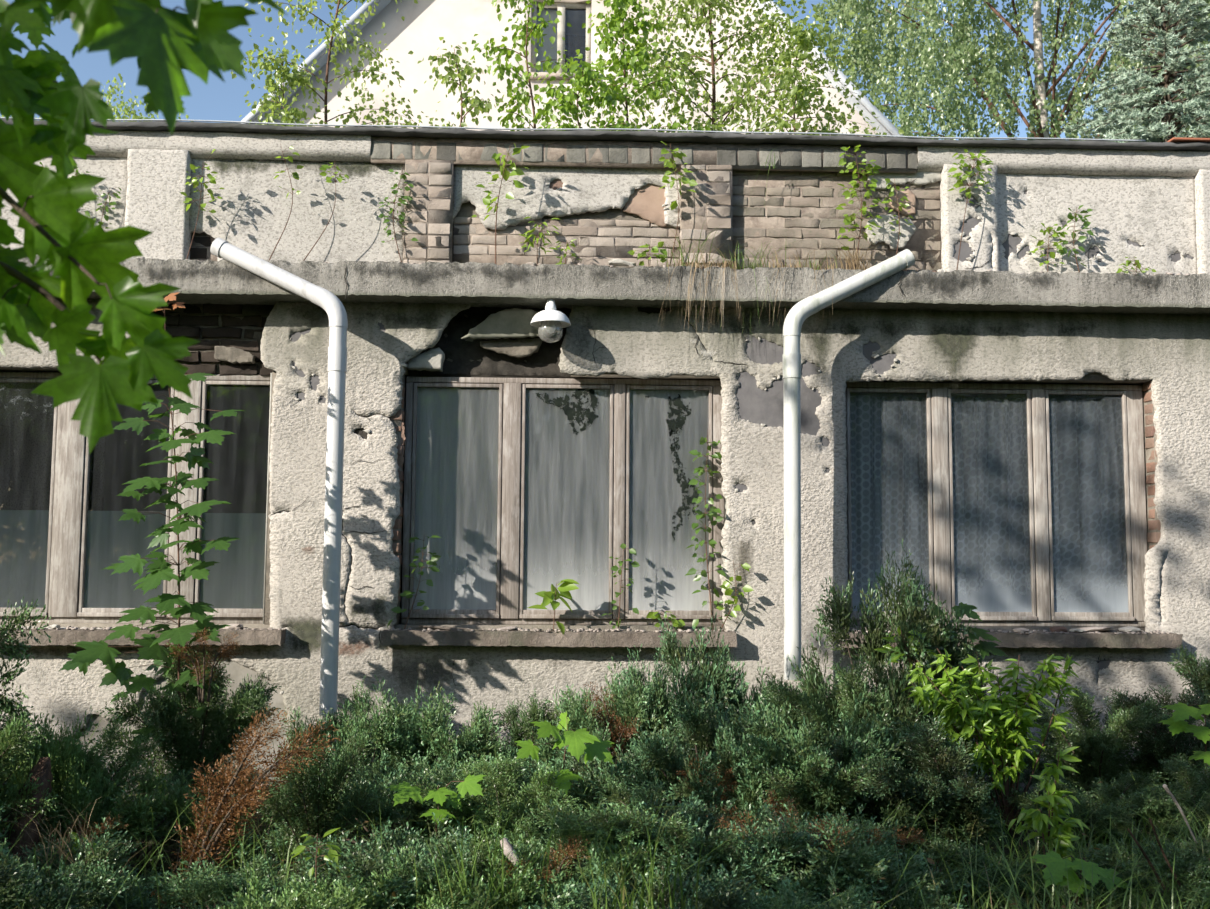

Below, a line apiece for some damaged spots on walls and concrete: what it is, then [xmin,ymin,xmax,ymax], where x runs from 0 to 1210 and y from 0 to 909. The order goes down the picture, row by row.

spalling [549,179,563,191]
spalling [953,192,982,262]
spalling [999,232,1056,260]
spalling [1085,246,1102,262]
spalling [1171,253,1194,262]
spalling [863,341,898,376]
spalling [736,327,784,428]
spalling [800,361,830,447]
crack [339,505,384,644]